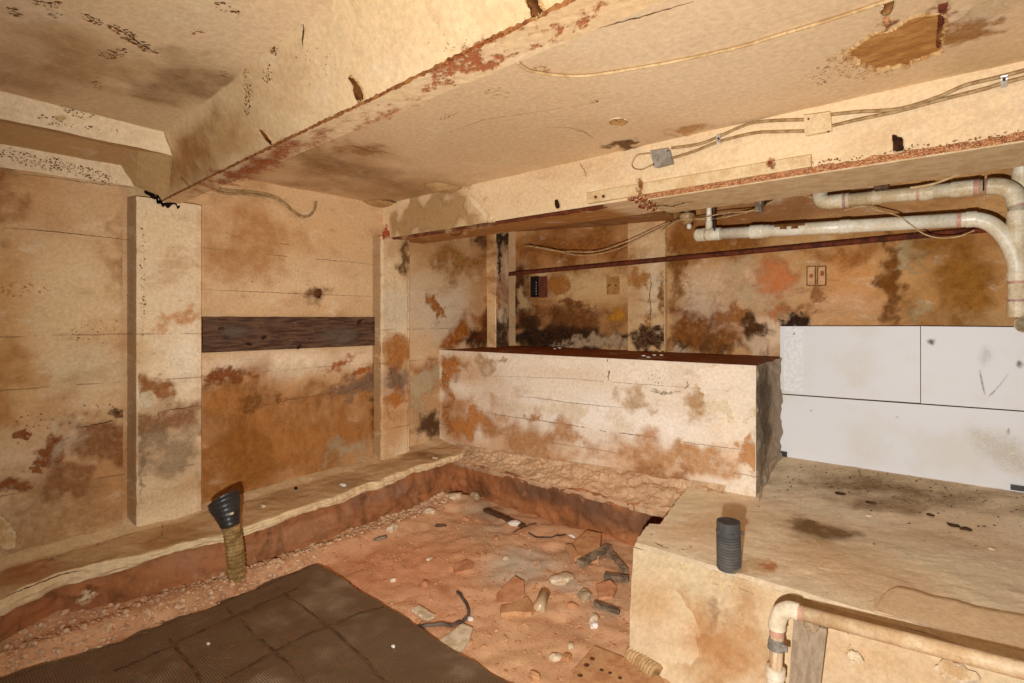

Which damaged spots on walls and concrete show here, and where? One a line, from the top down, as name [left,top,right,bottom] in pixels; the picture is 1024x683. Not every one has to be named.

spalling [806,0,949,85]
rust [161,0,607,202]
spalling [884,130,1024,154]
spalling [629,196,658,212]
damp [138,217,825,498]
damp [6,408,123,552]
damp [795,519,860,544]
damp [823,478,973,513]